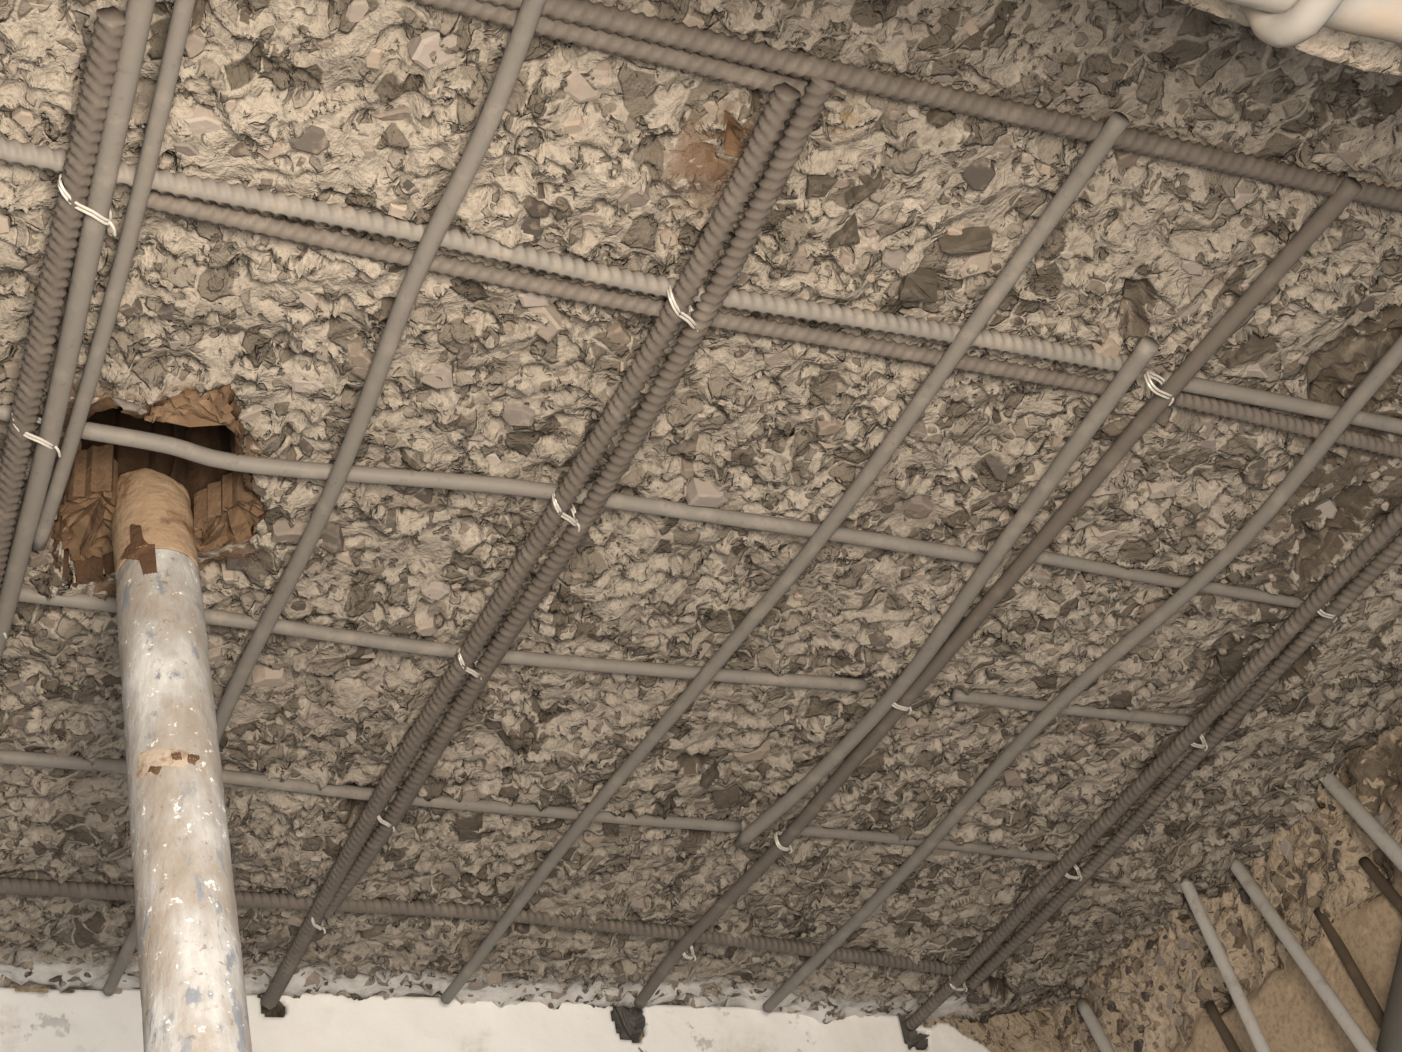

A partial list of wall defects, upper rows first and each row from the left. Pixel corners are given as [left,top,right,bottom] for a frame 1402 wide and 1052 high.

spalling [0,160,61,466]
spalling [0,0,128,151]
spalling [121,0,175,164]
spalling [151,190,419,250]
spalling [156,0,512,224]
spalling [436,35,771,302]
spalling [703,99,800,284]
spalling [733,86,1090,326]
spalling [589,0,1402,190]
spalling [0,184,409,994]
spalling [219,148,1402,1052]